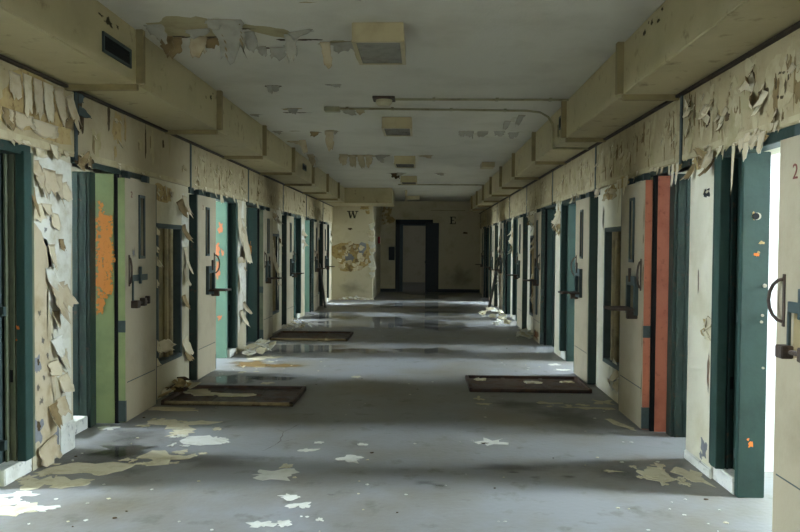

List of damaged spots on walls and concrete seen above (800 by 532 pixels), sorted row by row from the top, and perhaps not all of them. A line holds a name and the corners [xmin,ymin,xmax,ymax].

peeling [143,16,357,69]
peeling [487,34,800,309]
peeling [0,69,395,467]
peeling [45,476,95,489]
peeling [636,466,715,487]